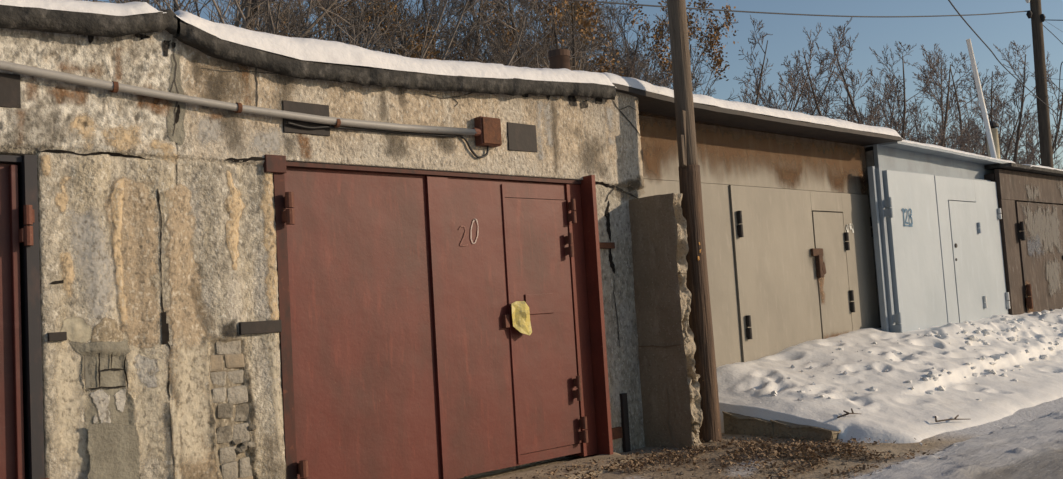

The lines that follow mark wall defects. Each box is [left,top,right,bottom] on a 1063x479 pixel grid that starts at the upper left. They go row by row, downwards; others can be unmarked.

crack [40,50,329,160]
crack [225,155,265,163]
crack [595,181,678,348]
peeling [1021,184,1063,298]
damp [53,350,90,470]
spalling [80,353,136,427]
crack [157,188,175,479]
spalling [203,320,257,479]